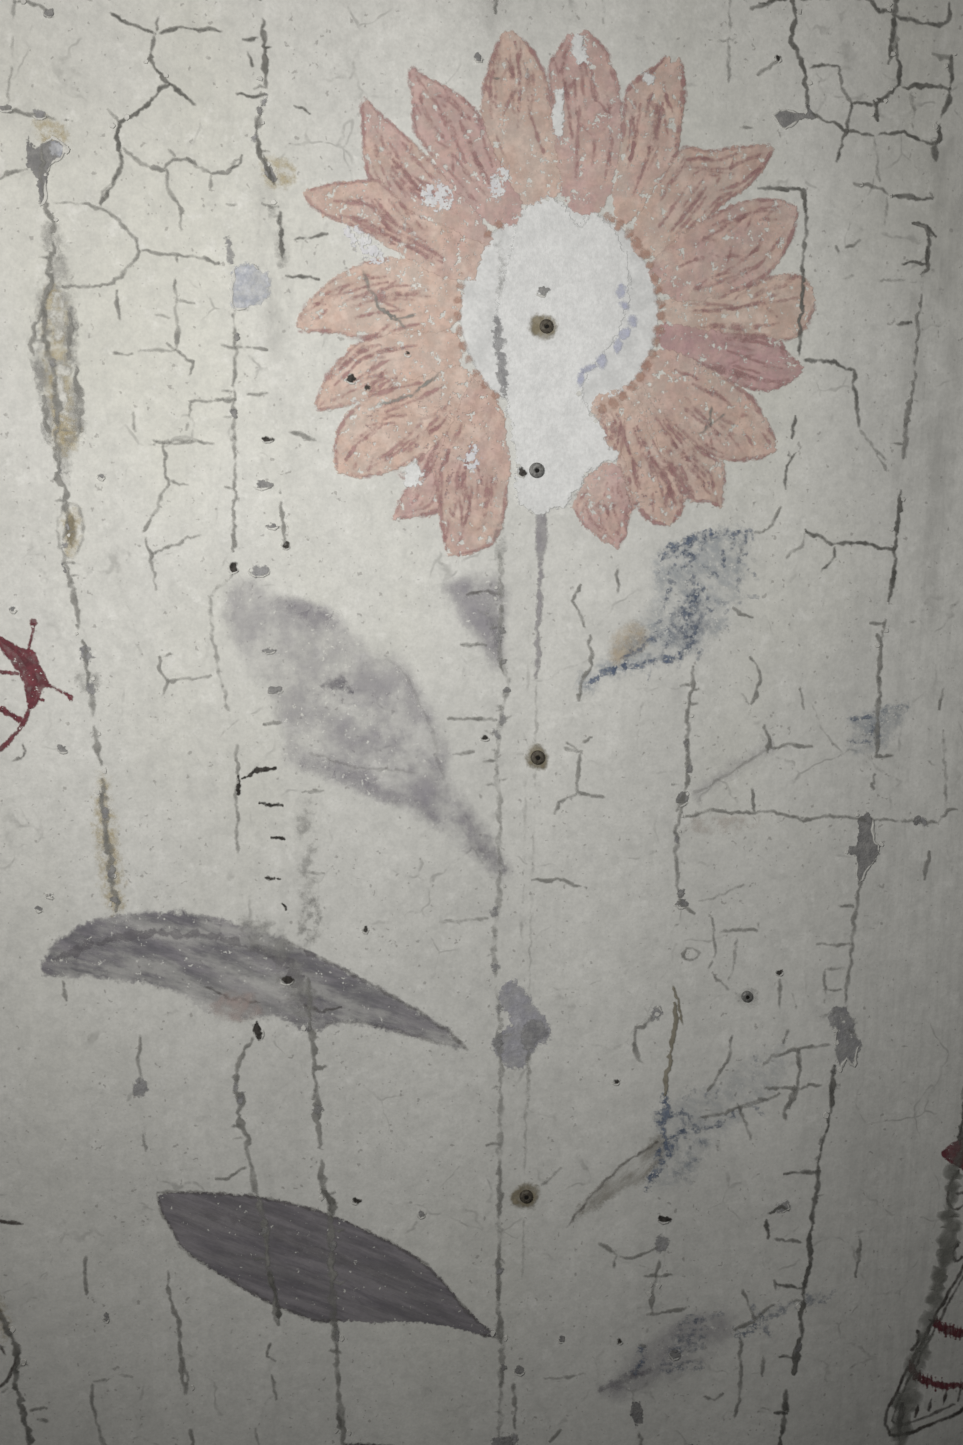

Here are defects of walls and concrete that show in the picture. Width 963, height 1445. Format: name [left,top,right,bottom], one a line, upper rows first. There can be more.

crack [29,13,328,912]
peeling [462,444,483,473]
peeling [492,195,632,517]
crack [728,0,957,464]
crack [447,557,511,762]
crack [671,415,954,981]
crack [0,1311,47,1445]
crack [216,1038,282,1393]
crack [301,980,351,1445]
crack [632,987,682,1096]
crack [701,984,836,1445]
crack [892,1104,963,1445]